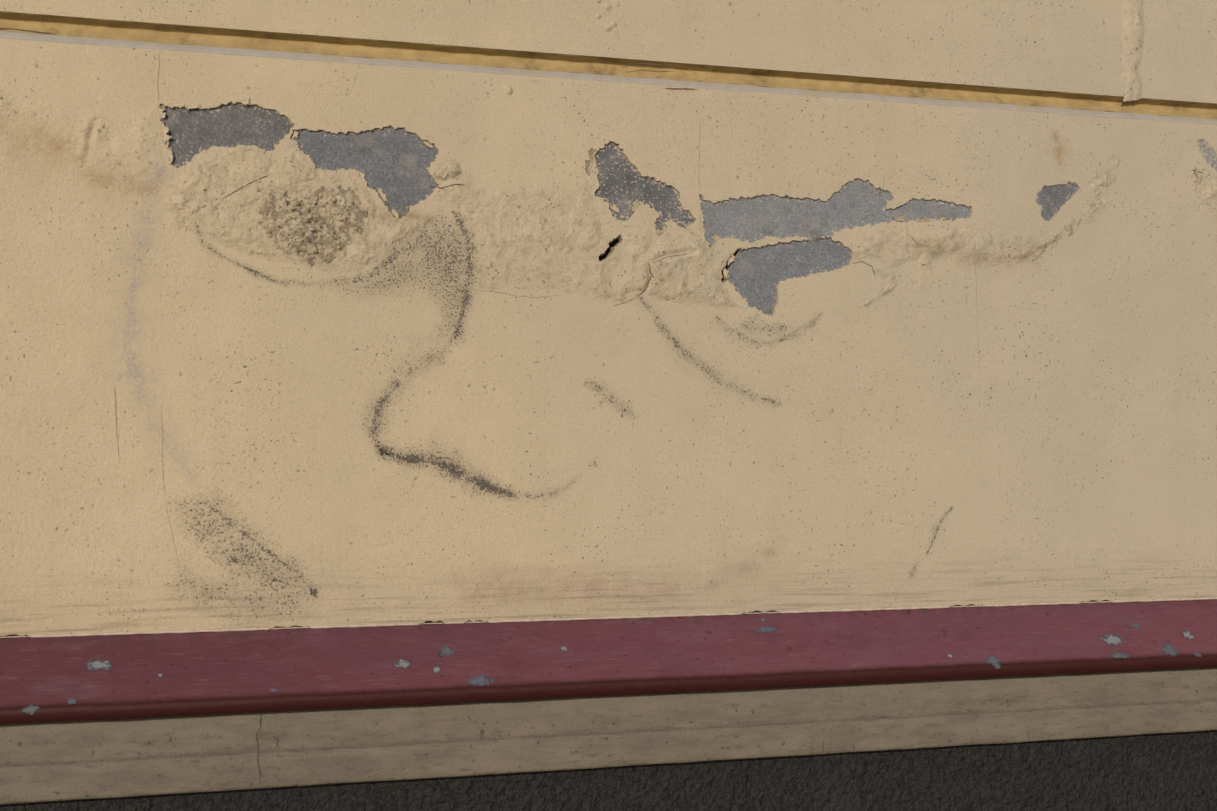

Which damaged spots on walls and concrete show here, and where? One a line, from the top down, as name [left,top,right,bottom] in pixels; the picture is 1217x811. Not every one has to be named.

crack [0,27,54,35]
peeling [1194,139,1217,181]
peeling [158,99,438,267]
peeling [1036,182,1078,221]
peeling [585,142,971,316]